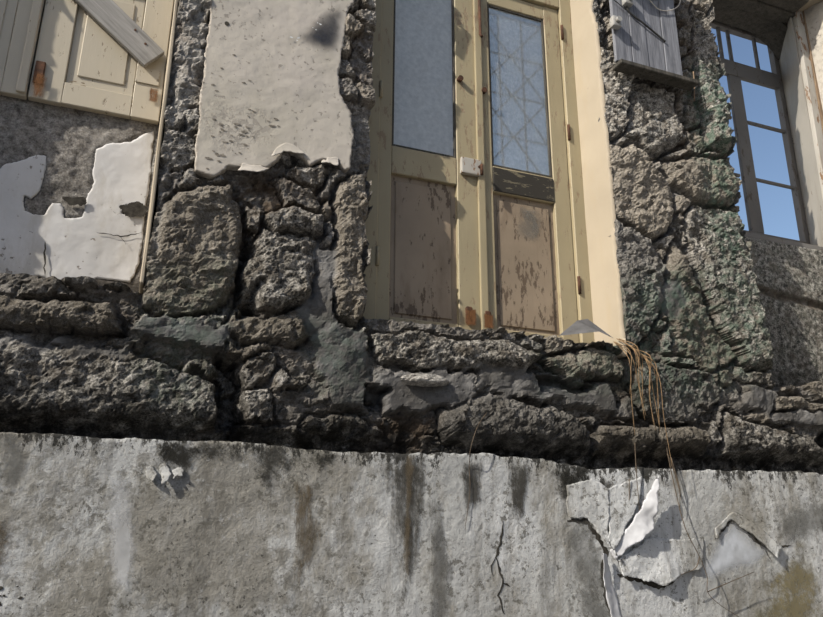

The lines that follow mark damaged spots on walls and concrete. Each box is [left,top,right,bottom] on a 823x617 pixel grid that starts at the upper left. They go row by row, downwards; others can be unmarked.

flaking render [62,196,87,206]
flaking render [119,201,148,217]
water stain [158,440,241,470]
water stain [251,444,290,487]
water stain [316,453,335,471]
water stain [462,463,482,509]
water stain [508,466,530,519]
water stain [386,455,426,596]
water stain [431,517,452,593]
crack [491,525,510,614]
peeling [566,476,782,617]
water stain [766,561,821,617]